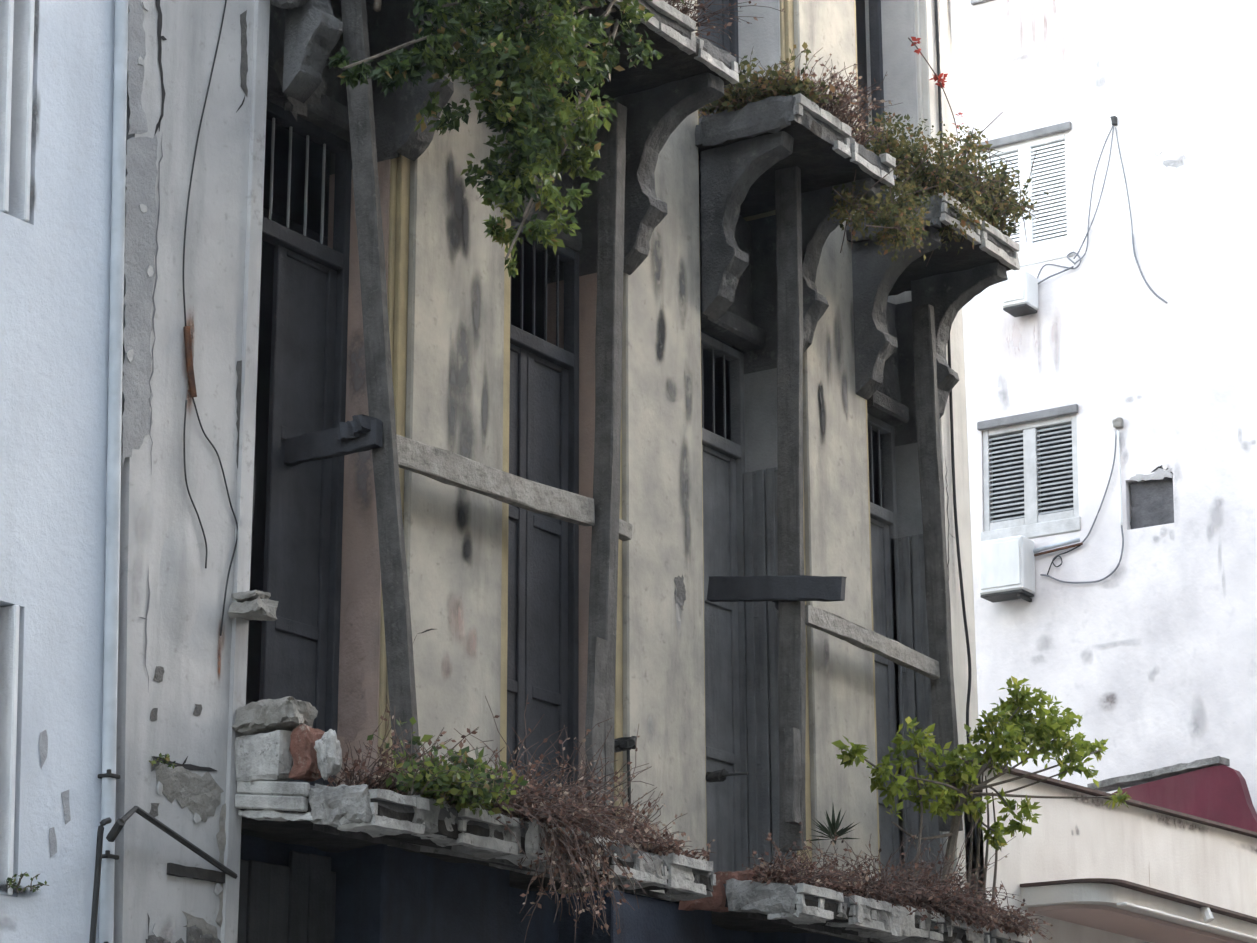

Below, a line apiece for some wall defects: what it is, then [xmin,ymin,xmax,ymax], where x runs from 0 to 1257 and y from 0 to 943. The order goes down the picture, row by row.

peeling [122,0,158,464]
crack [149,0,167,469]
water stain [448,158,469,255]
spalling [149,758,226,865]